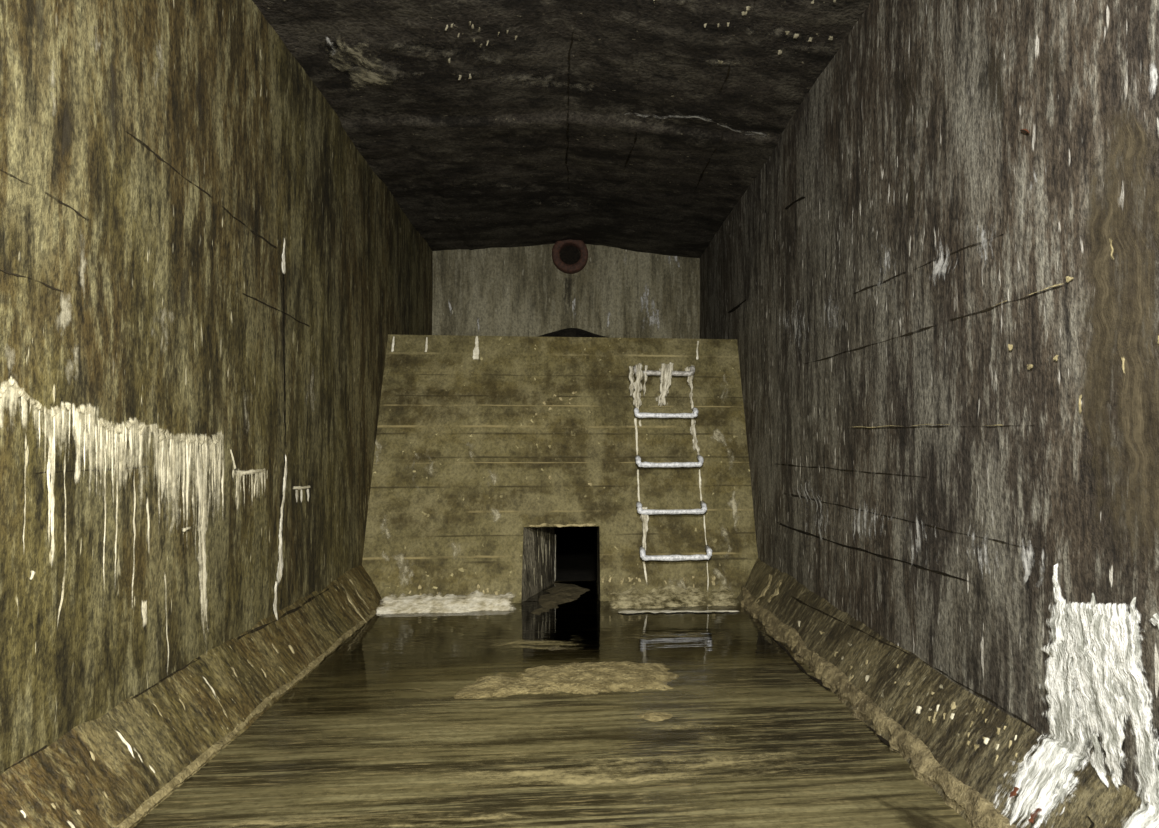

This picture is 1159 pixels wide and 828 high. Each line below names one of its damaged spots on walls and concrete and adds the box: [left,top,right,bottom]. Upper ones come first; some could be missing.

crack [0,269,63,292]
damp [60,297,71,328]
crack [126,131,309,536]
damp [629,341,700,455]
damp [0,353,268,628]
damp [273,455,310,620]
damp [601,469,739,614]